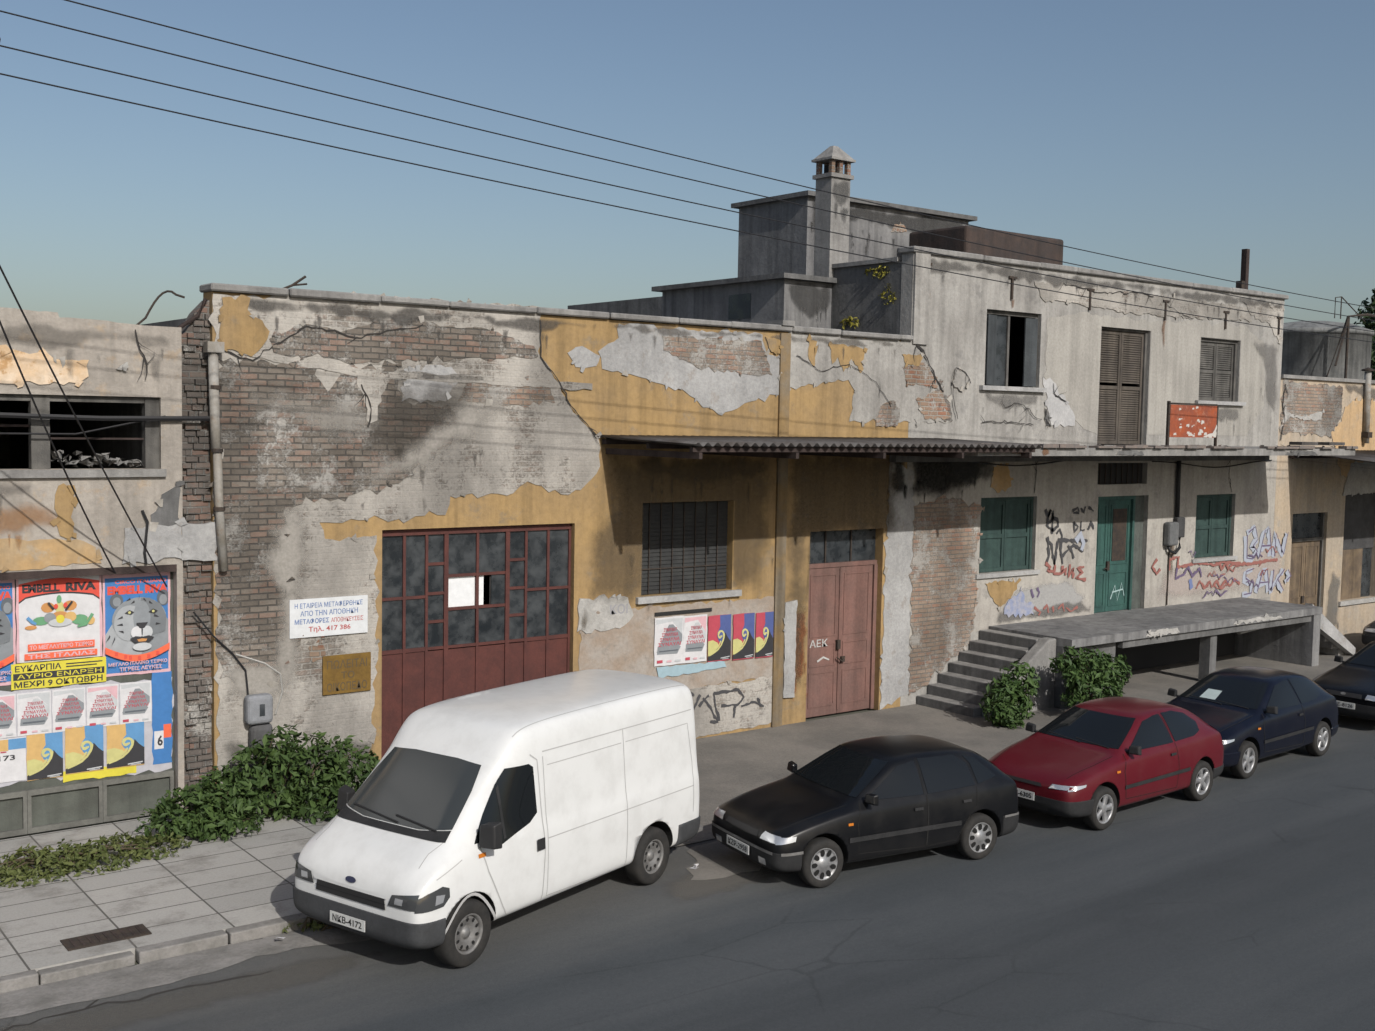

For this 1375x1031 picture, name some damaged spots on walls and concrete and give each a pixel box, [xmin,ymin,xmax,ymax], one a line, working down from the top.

crack [1056,278,1192,320]
peeling [0,345,89,388]
flaking render [568,323,952,427]
leakage [950,462,992,492]
flaking render [1279,379,1375,496]
flaking render [208,291,602,799]
flaking render [879,462,1021,710]
flaking render [578,594,798,738]